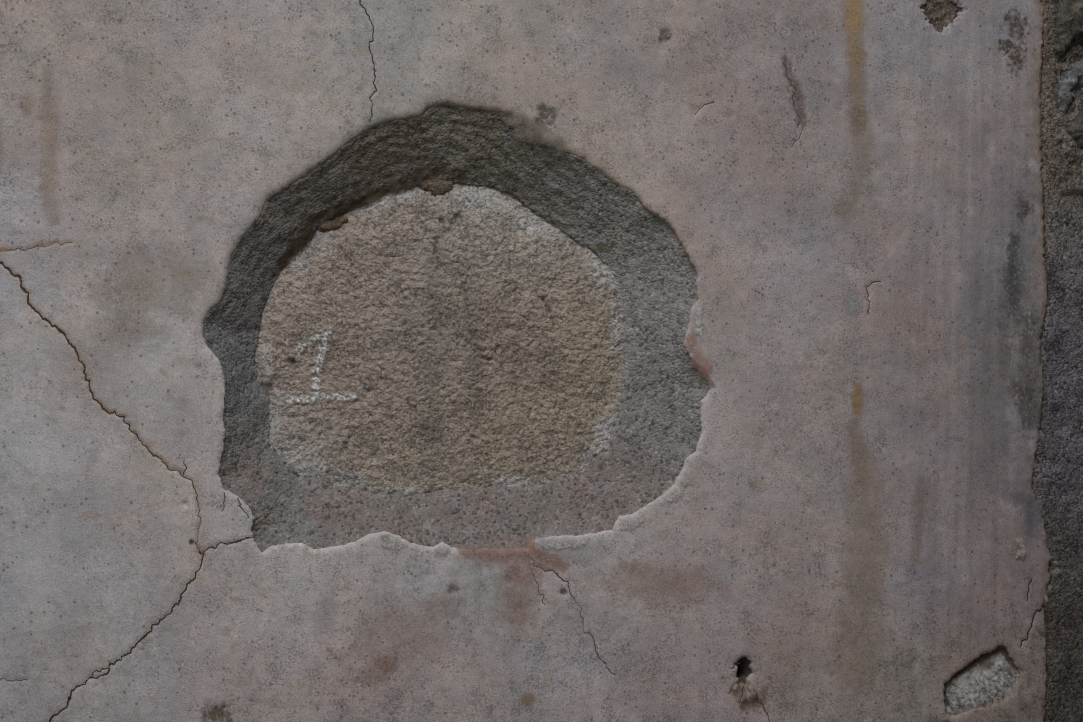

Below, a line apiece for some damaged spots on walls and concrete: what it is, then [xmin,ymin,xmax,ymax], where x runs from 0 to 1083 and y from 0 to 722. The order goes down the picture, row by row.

crack [359,0,377,121]
spalling [920,0,962,33]
spalling [203,106,710,555]
crack [0,241,252,722]
crack [521,549,615,675]
spalling [944,646,1020,716]